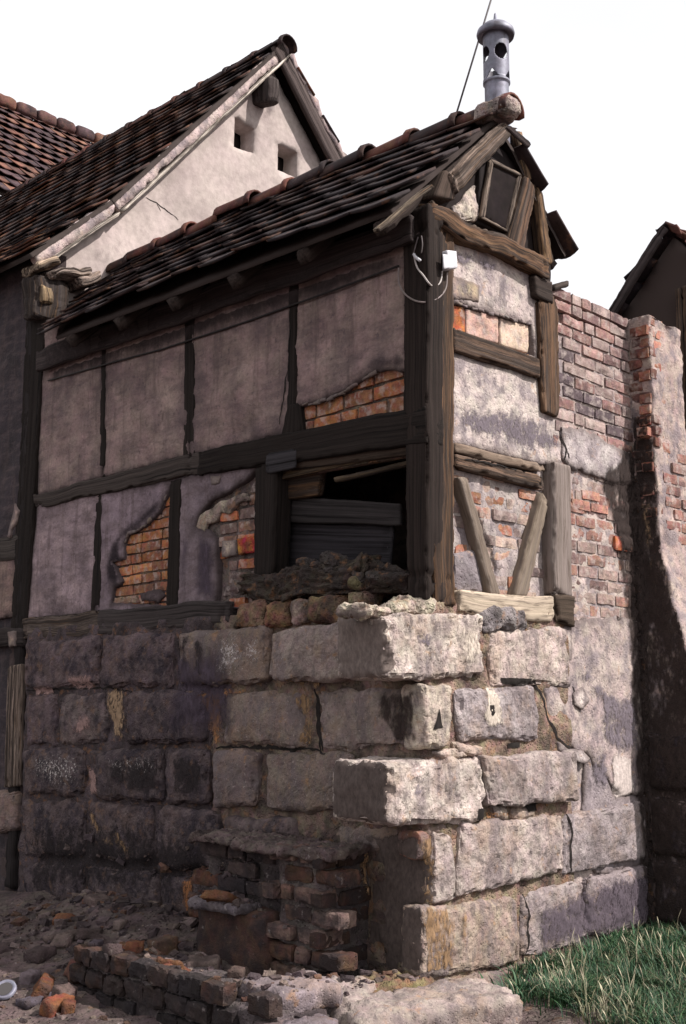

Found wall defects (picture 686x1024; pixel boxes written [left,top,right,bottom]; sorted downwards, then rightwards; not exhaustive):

flaking render [453,276,532,355]
flaking render [302,370,404,429]
flaking render [113,495,170,606]
flaking render [196,478,256,607]
crack [510,680,579,750]